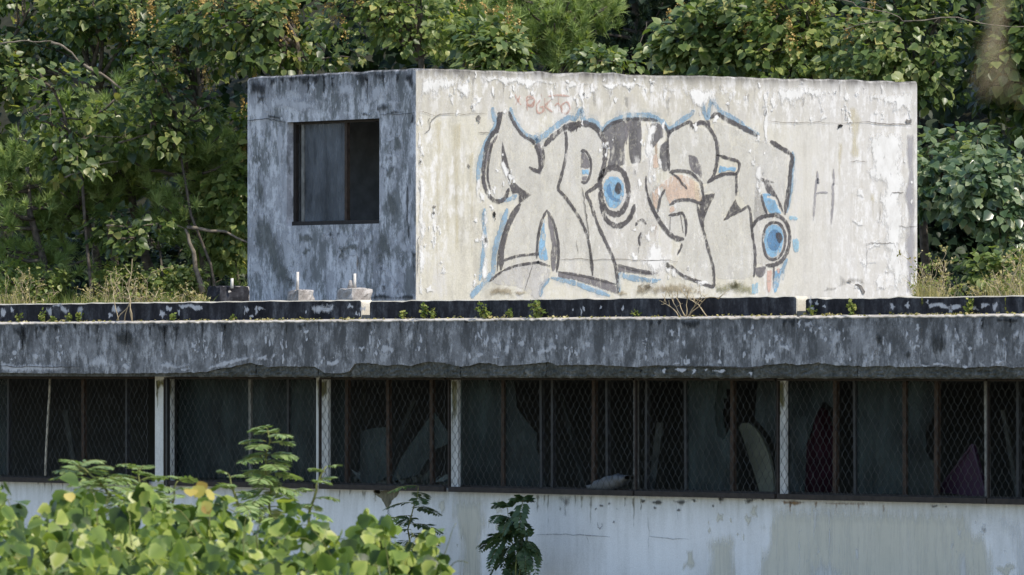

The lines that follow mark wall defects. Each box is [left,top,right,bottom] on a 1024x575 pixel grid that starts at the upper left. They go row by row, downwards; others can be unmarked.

leakage [252,75,333,102]
leakage [356,74,413,98]
peeling [422,72,747,131]
peeling [748,83,912,193]
leakage [386,187,409,237]
peeling [847,133,915,294]
leakage [257,223,294,287]
leakage [330,233,391,262]
leakage [14,325,59,349]
leakage [115,326,132,345]
spalling [160,298,1024,379]